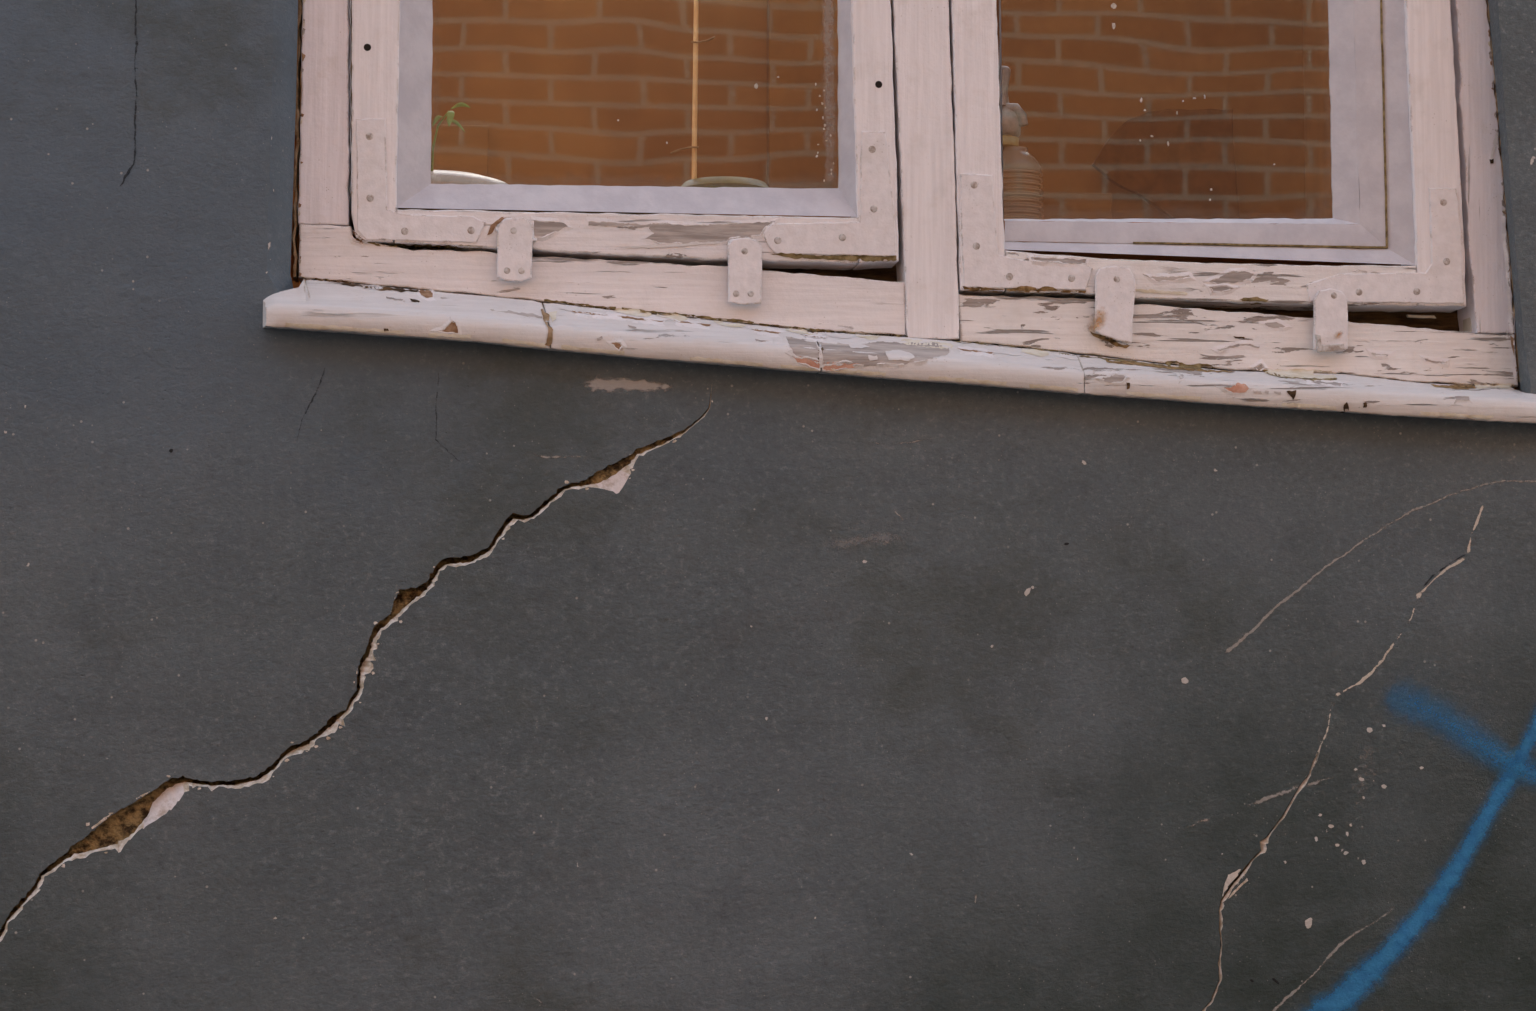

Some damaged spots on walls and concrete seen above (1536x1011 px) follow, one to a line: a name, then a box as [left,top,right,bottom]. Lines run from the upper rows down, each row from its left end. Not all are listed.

peeling [299,240,436,306]
peeling [429,317,462,335]
peeling [485,267,1367,413]
peeling [1026,254,1089,267]
crack [0,388,713,942]
crack [1202,505,1483,1011]